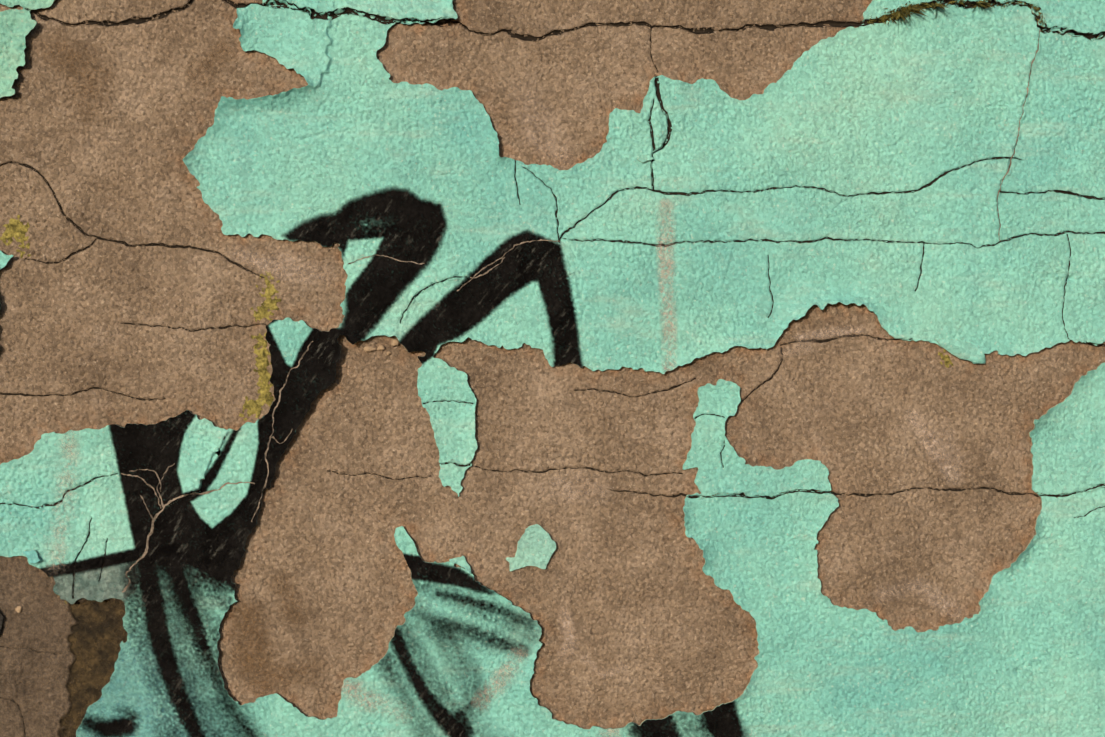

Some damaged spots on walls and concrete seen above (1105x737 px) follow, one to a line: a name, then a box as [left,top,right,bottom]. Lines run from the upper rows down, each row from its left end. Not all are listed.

crack [25,0,194,26]
peeling [376,0,872,170]
crack [1,161,264,278]
peeling [0,0,348,465]
crack [223,0,1105,347]
crack [0,341,313,599]
crack [120,322,268,332]
crack [574,378,696,397]
peeling [217,302,1105,729]
crack [327,462,1105,517]
crack [694,334,912,468]
peeling [0,550,75,737]